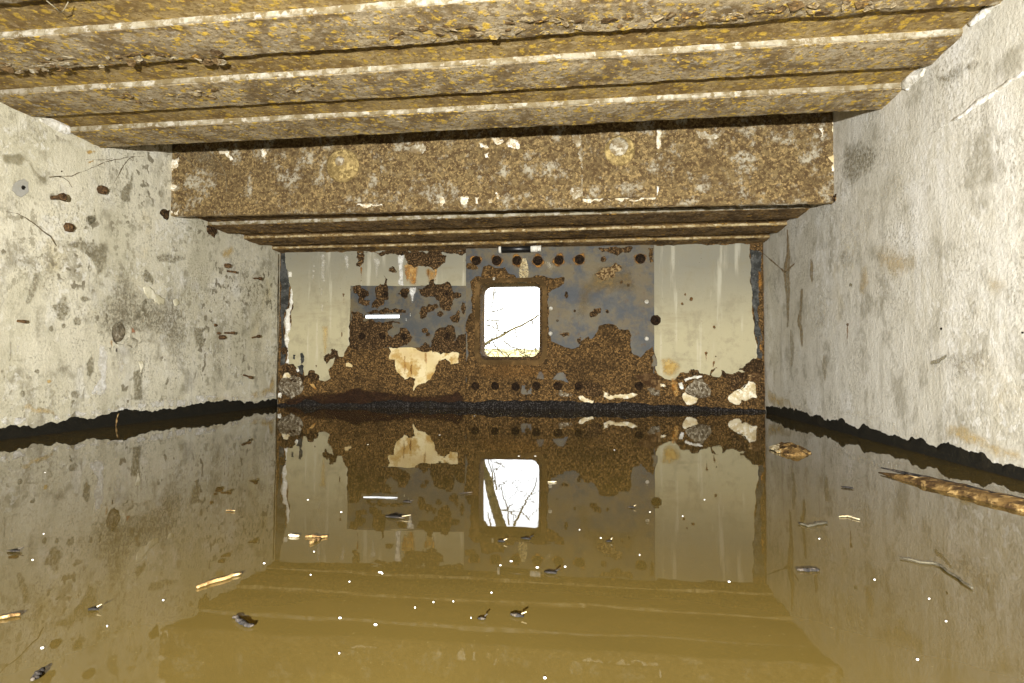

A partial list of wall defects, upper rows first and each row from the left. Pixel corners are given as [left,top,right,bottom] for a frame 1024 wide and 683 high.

rust [281,329,338,390]
peeling [278,250,466,399]
rust [341,246,678,406]
peeling [521,243,762,405]
rust [689,343,765,405]